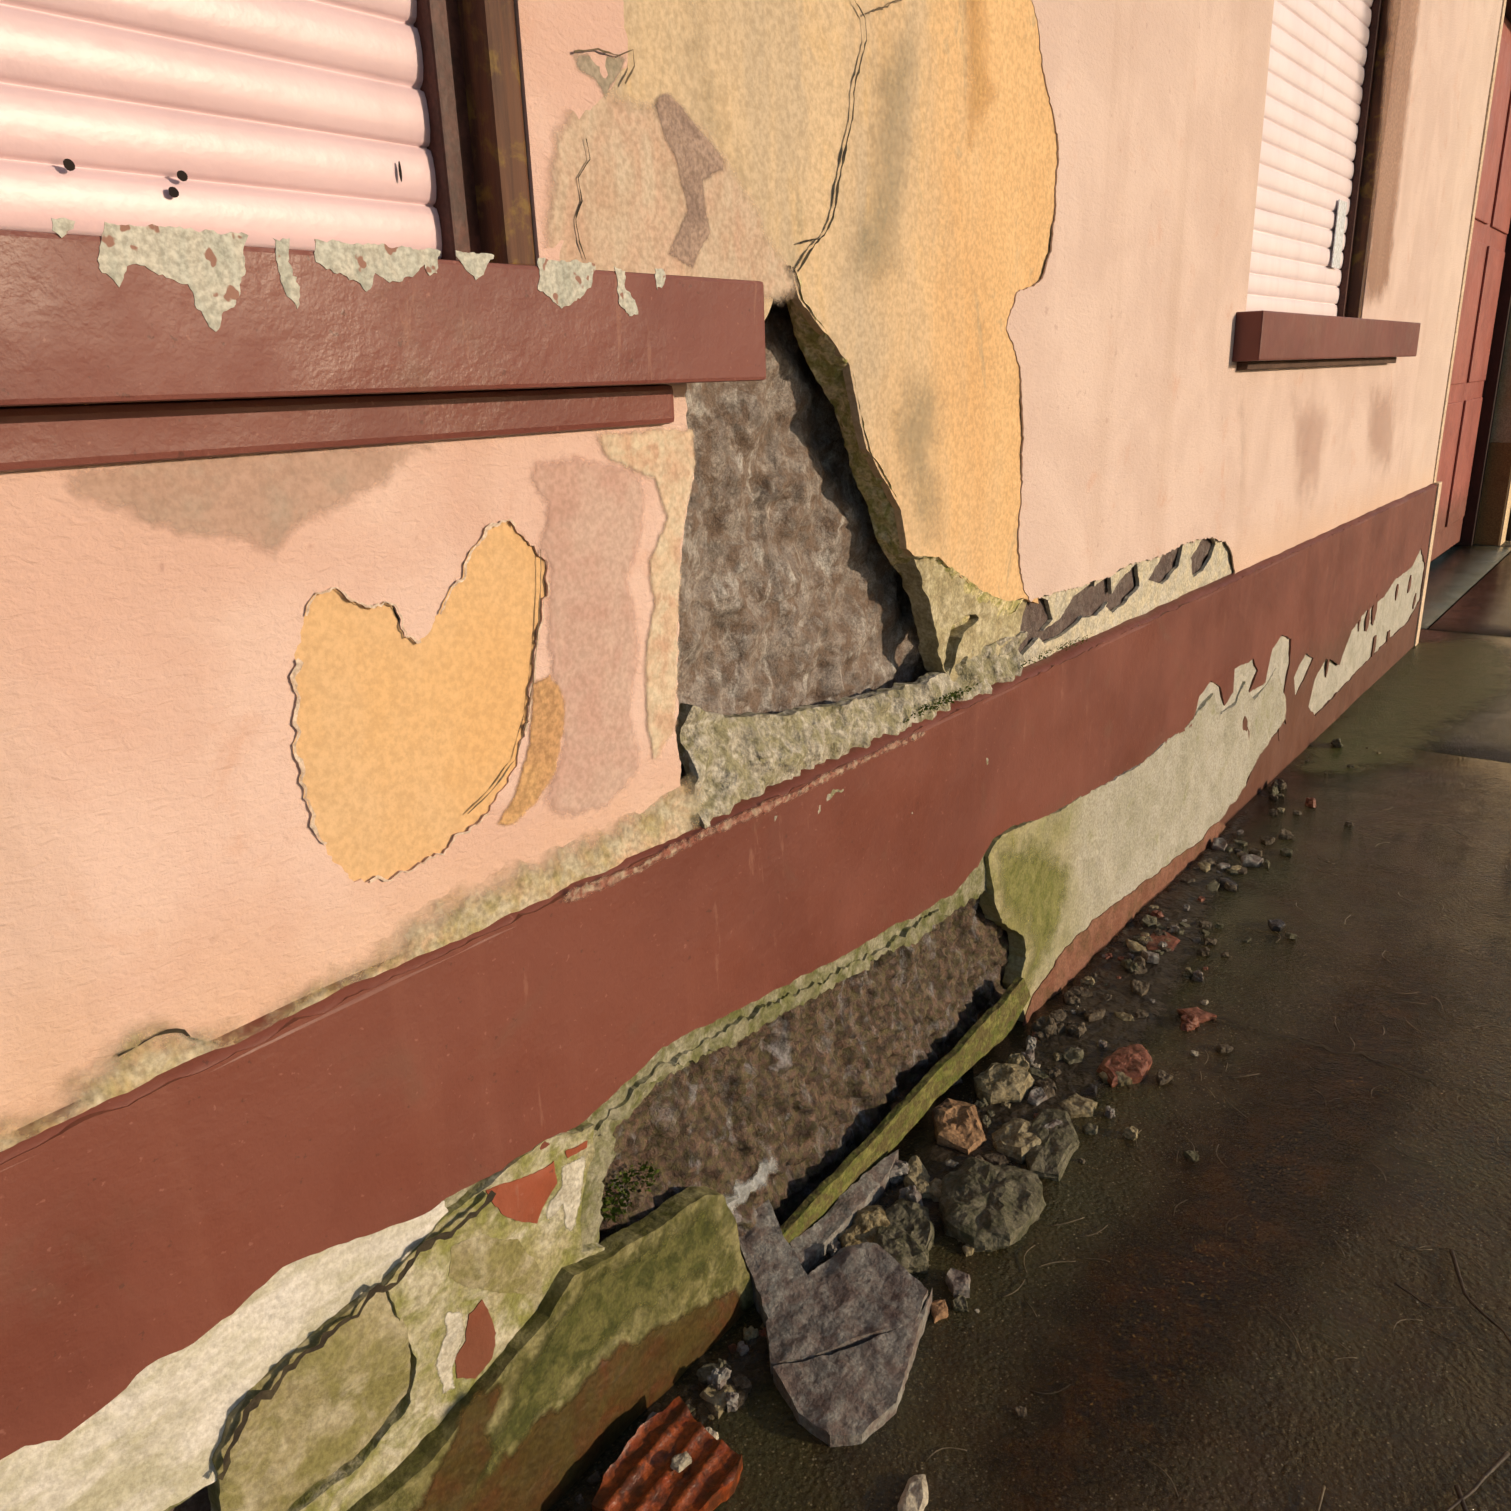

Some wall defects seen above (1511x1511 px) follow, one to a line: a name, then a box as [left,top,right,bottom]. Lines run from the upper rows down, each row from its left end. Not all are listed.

peeling [51,218,75,238]
peeling [97,222,248,332]
peeling [273,238,300,309]
crack [797,0,902,272]
peeling [288,0,1234,1017]
damp [1296,639,1511,773]
flaking render [0,549,1424,1511]
crack [216,1190,496,1480]